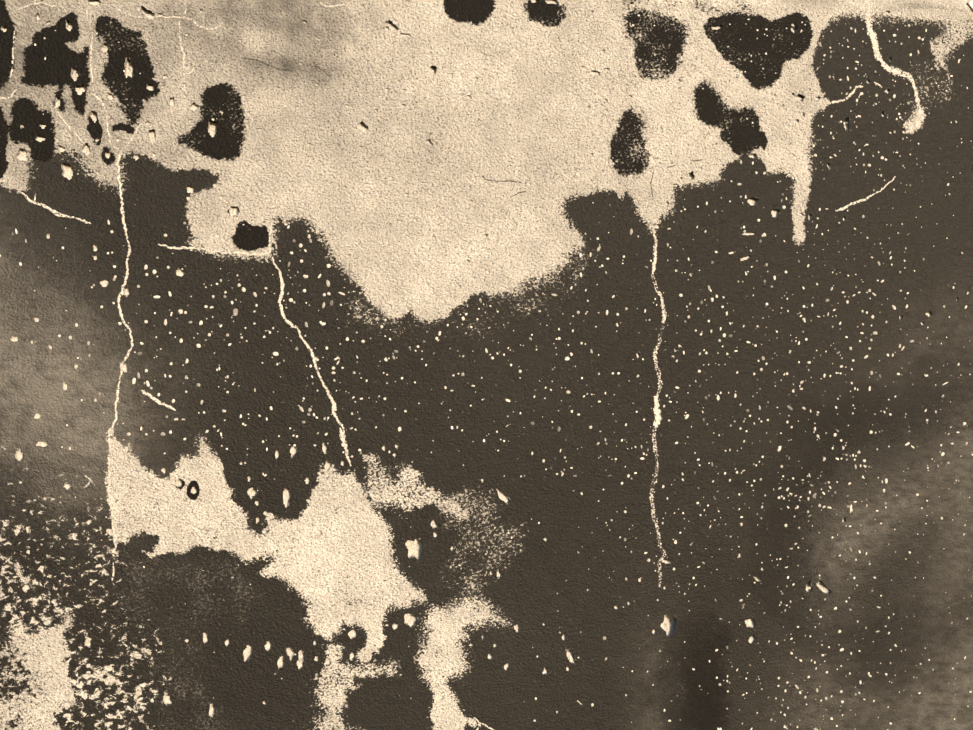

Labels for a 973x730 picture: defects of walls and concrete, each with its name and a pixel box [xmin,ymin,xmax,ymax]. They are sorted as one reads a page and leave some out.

water stain [0,0,161,179]
crack [113,3,223,92]
water stain [177,83,247,161]
crack [241,57,293,72]
water stain [608,106,653,179]
water stain [621,0,690,82]
water stain [692,78,768,155]
water stain [692,0,813,90]
crack [829,0,924,130]
crack [0,0,176,581]
crack [158,223,351,466]
crack [649,228,667,587]